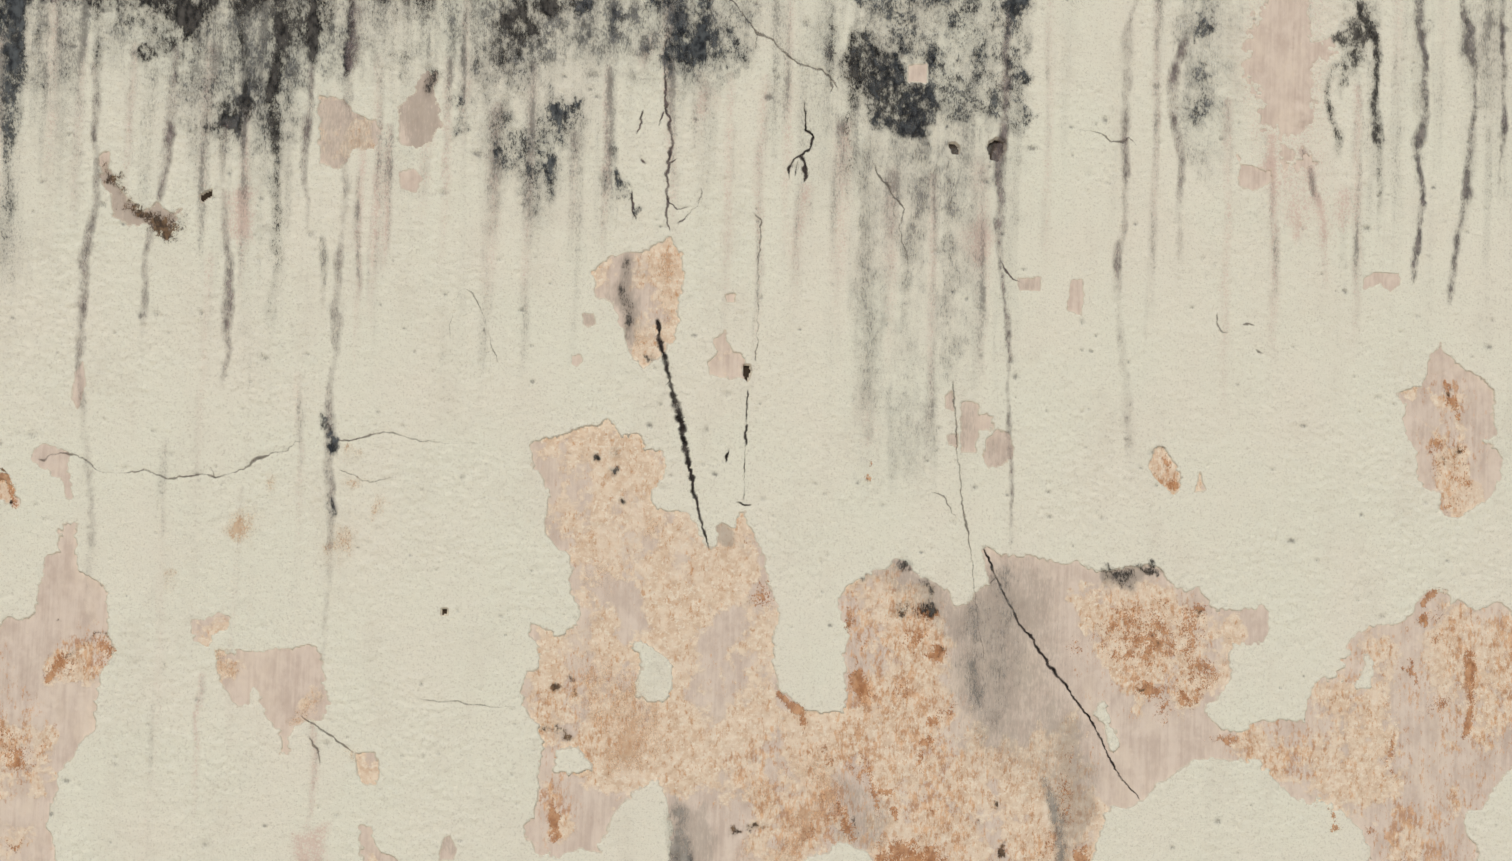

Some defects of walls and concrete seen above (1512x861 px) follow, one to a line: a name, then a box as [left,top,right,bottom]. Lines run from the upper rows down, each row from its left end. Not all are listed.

leakage [0,0,51,214]
leakage [86,0,398,264]
spalling [398,71,443,148]
leakage [448,0,753,77]
leakage [825,0,1038,245]
leakage [1325,0,1384,147]
spalling [582,237,684,369]
crack [656,319,757,544]
spalling [1398,343,1503,517]
spalling [0,523,114,861]
spalling [521,419,1512,861]
crack [941,489,1139,798]